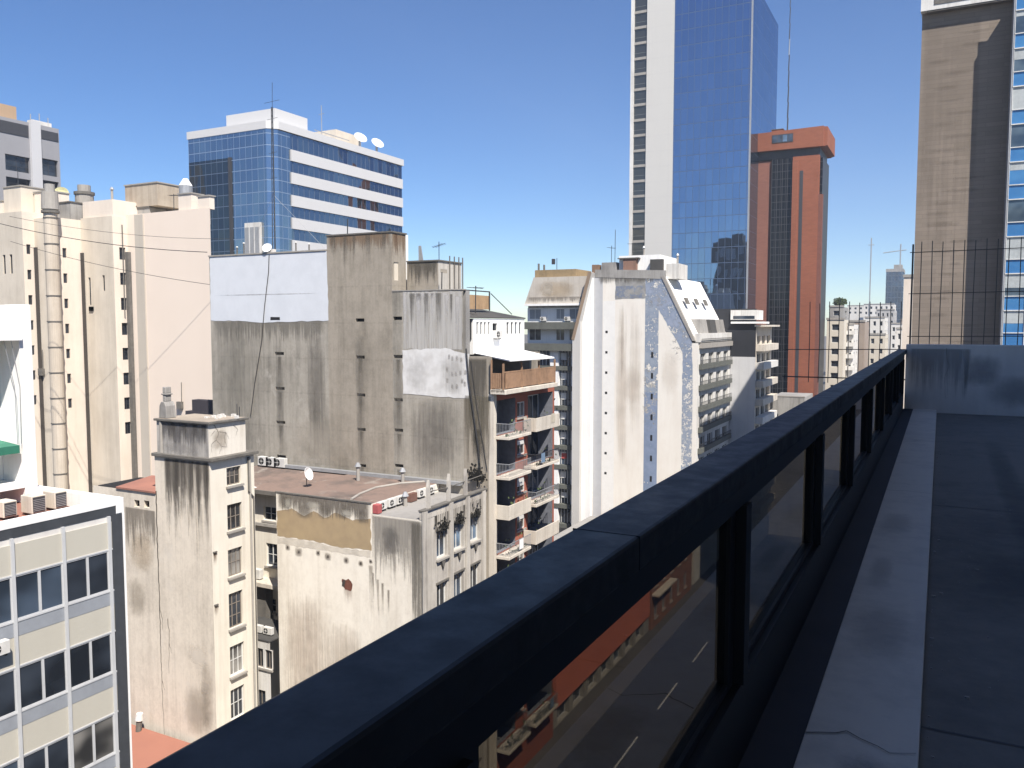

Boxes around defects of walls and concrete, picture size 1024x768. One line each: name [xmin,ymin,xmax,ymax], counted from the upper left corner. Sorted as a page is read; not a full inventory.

crack [156,491,171,735]
water stain [165,459,208,522]
peeling [277,508,372,566]
water stain [280,494,422,618]
peeling [643,371,658,491]
peeling [681,380,693,470]